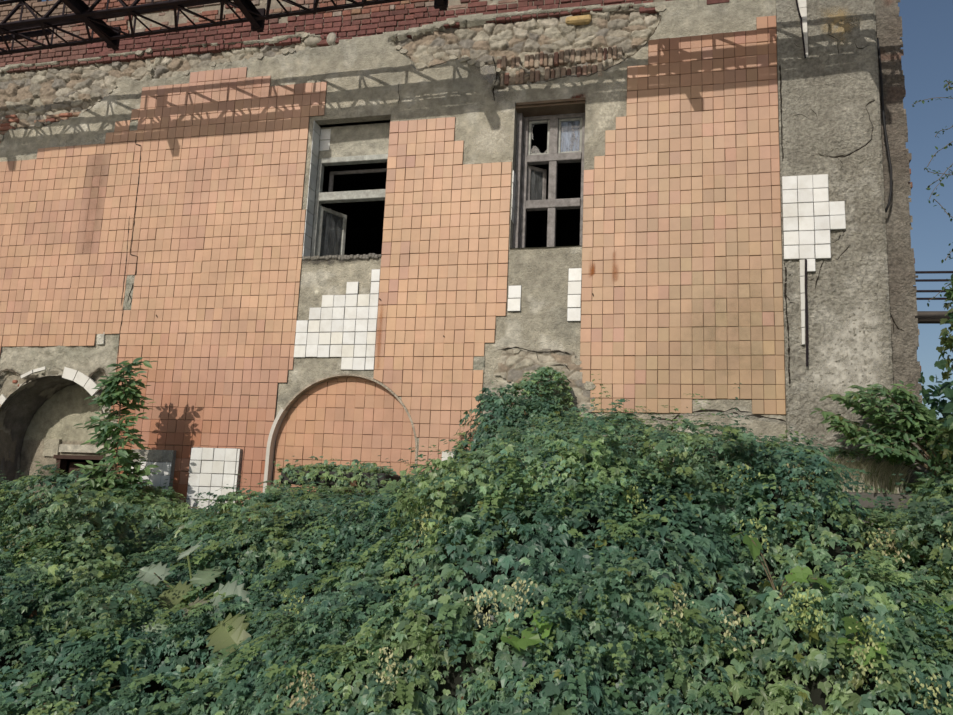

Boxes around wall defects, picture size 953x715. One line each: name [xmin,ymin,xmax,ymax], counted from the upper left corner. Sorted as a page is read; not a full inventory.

spalling [0,32,340,142]
spalling [390,3,666,90]
crack [116,139,141,372]
spalling [0,334,119,407]